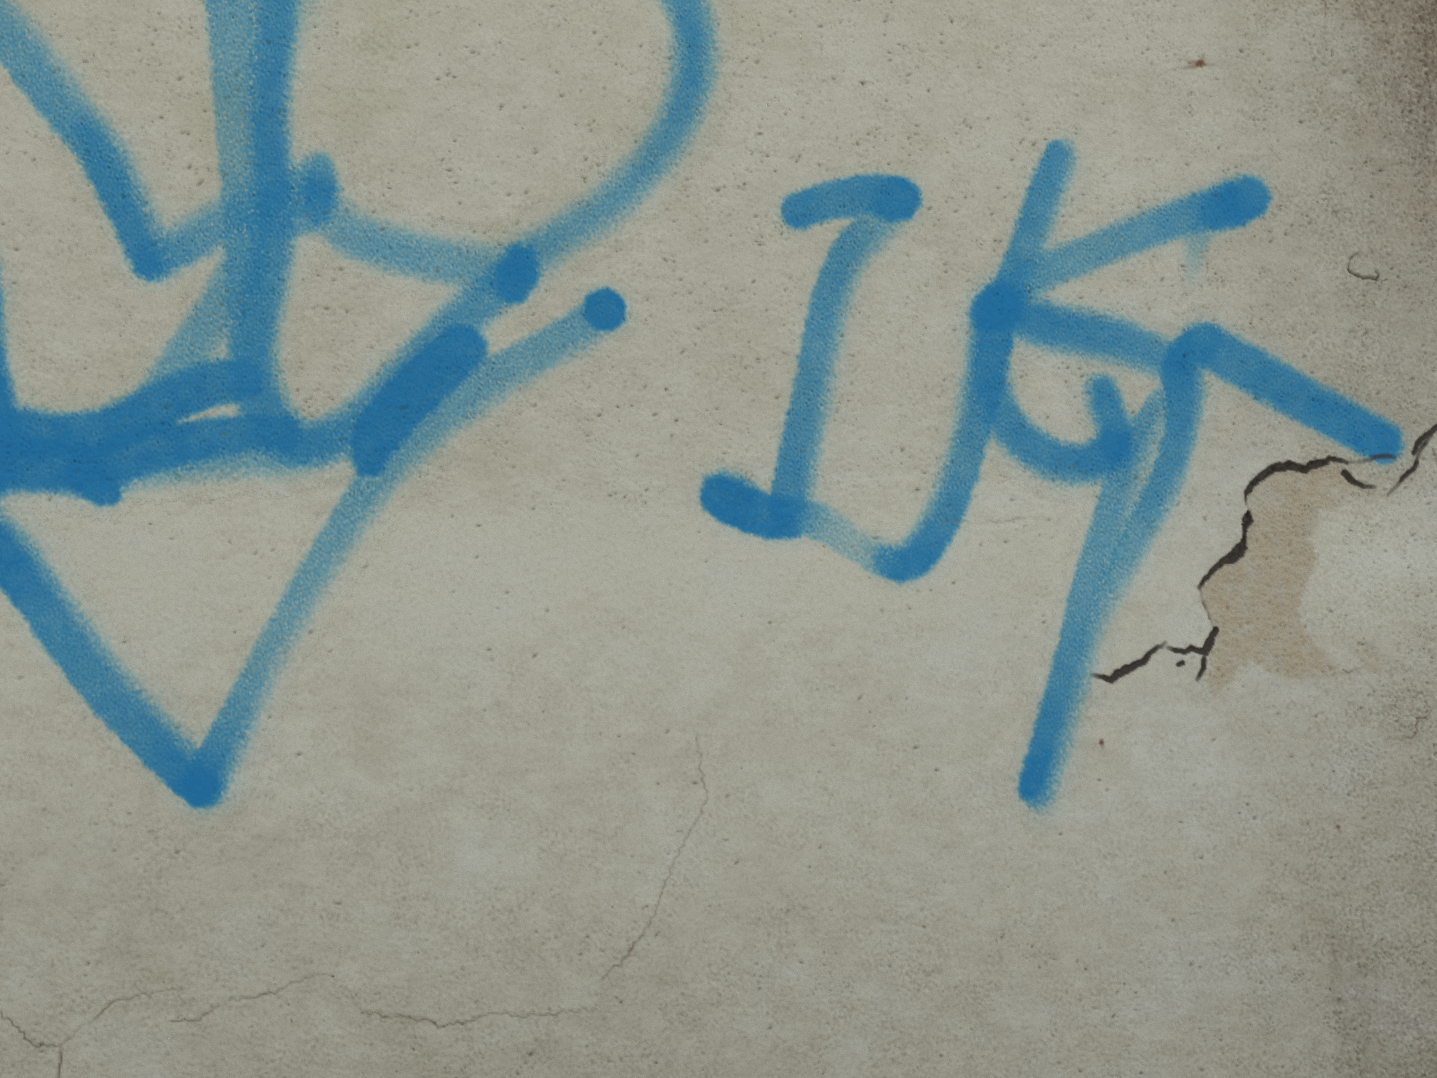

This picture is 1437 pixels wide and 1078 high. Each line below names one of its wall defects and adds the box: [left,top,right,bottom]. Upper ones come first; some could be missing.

spalling [1200,457,1388,700]
crack [0,733,709,1078]